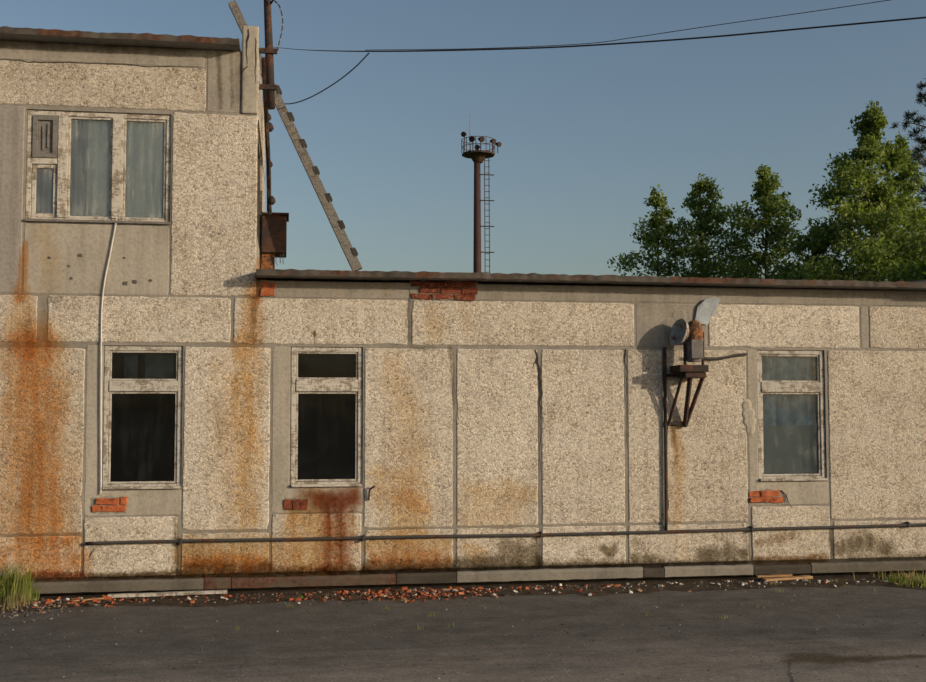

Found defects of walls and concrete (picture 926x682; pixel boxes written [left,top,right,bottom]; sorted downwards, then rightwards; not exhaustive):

flaking render [409,280,479,302]
crack [533,350,543,466]
corrosion [304,487,362,575]
corrosion [26,571,85,581]